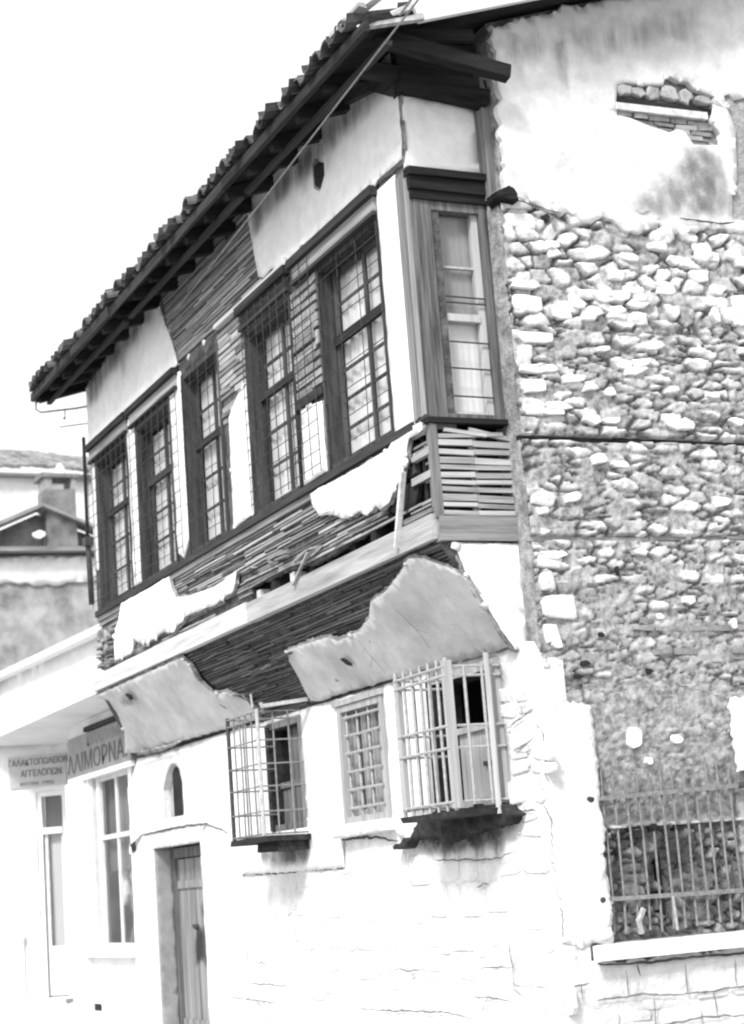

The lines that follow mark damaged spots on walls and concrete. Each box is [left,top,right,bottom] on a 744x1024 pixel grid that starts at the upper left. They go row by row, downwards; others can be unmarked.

spalling [615,75,744,221]
leakage [644,147,725,213]
spalling [99,272,527,723]